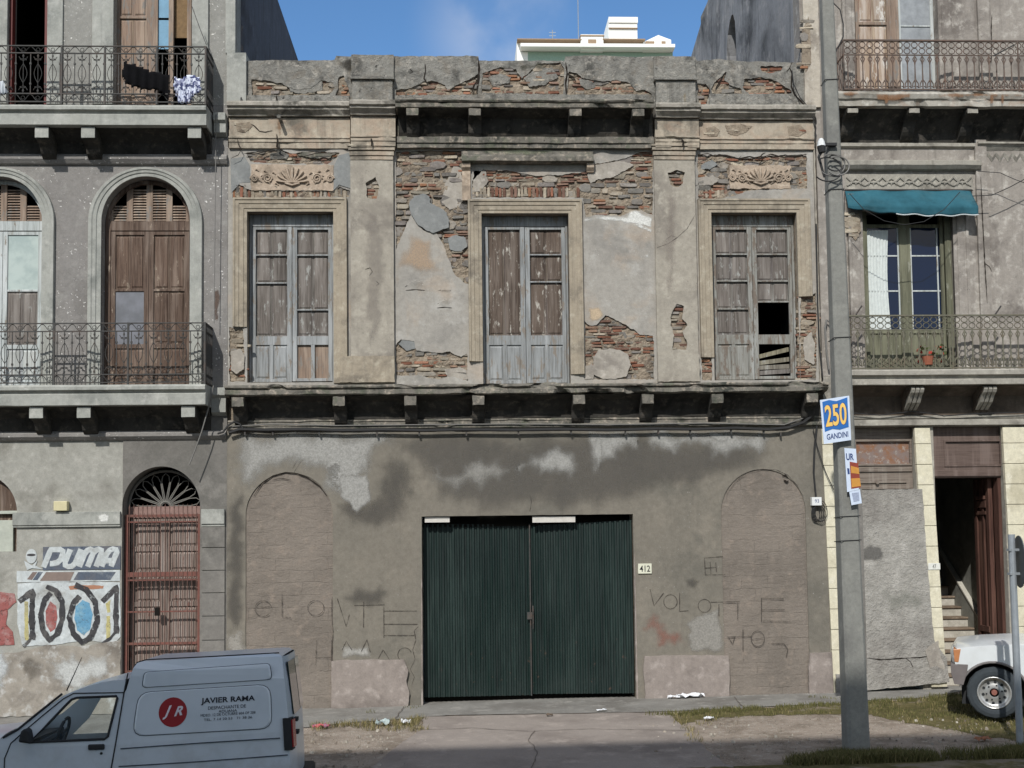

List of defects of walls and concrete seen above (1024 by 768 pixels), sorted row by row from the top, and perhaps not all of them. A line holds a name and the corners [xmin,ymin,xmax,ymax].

spalling [396,63,651,96]
spalling [697,67,791,105]
spalling [233,184,350,197]
spalling [247,150,339,164]
spalling [668,154,807,199]
spalling [395,150,653,284]
spalling [395,340,468,381]
spalling [579,316,654,380]
spalling [671,304,687,350]
spalling [795,294,822,380]
leakage [240,431,406,522]
leakage [414,430,764,504]